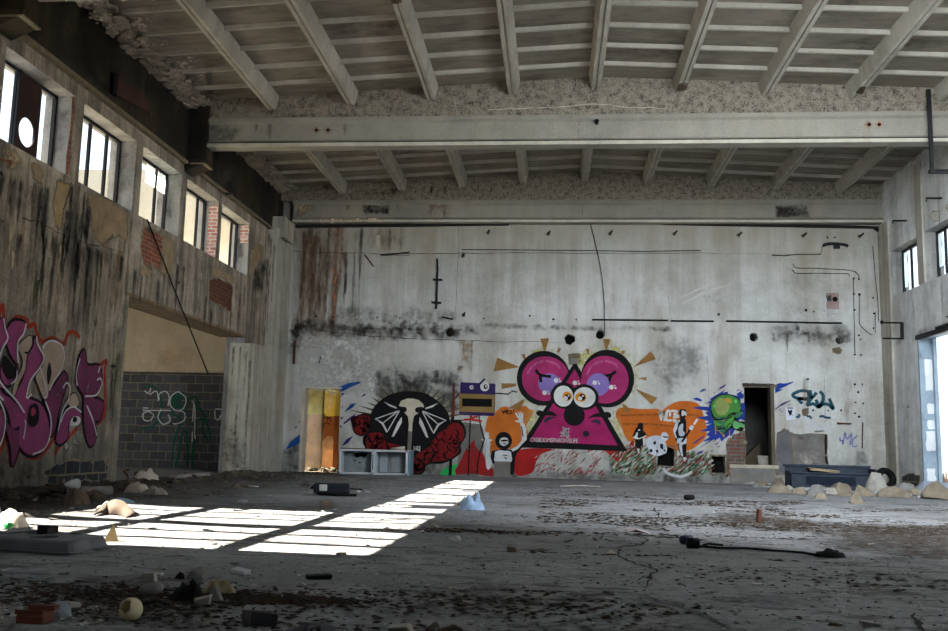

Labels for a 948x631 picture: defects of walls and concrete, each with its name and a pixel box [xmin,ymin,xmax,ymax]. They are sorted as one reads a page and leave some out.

spalling [75,0,213,109]
spalling [235,151,297,193]
flaking render [87,192,129,246]
water stain [0,177,159,325]
flaking render [140,225,175,275]
flaking render [208,277,233,312]
water stain [773,326,850,346]
crack [566,508,664,588]
crack [910,614,925,631]